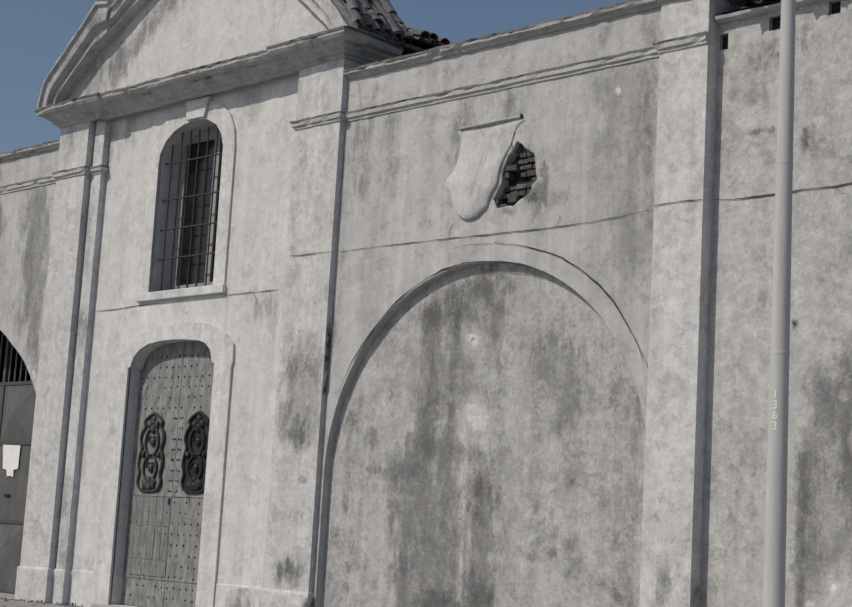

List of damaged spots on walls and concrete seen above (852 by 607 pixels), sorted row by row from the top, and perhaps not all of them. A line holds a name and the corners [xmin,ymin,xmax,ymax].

flaking render [490,137,540,211]
leakage [459,427,468,607]